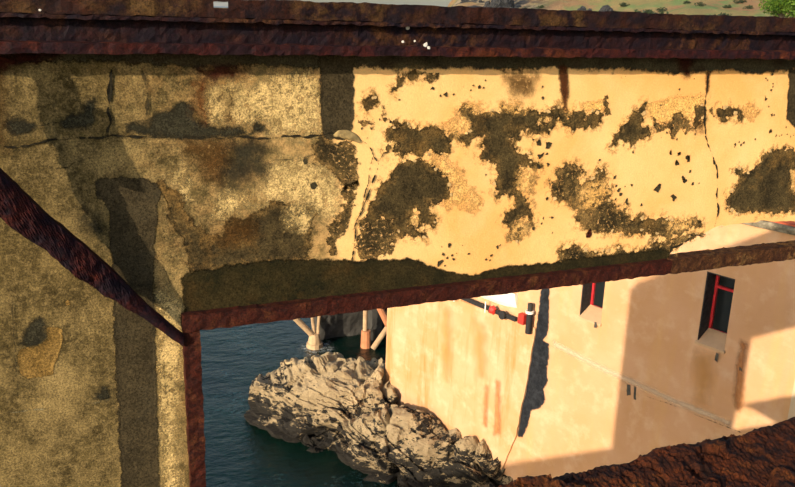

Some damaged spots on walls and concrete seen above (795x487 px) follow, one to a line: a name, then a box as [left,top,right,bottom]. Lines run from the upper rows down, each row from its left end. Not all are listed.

rust [0,53,57,70]
rust [505,71,533,94]
rust [558,65,569,111]
crack [4,122,57,148]
damp [126,101,268,188]
crack [76,70,334,160]
crack [703,74,719,216]
crack [351,140,387,261]
crack [669,234,702,254]
rust [734,343,746,408]
rust [483,381,500,433]